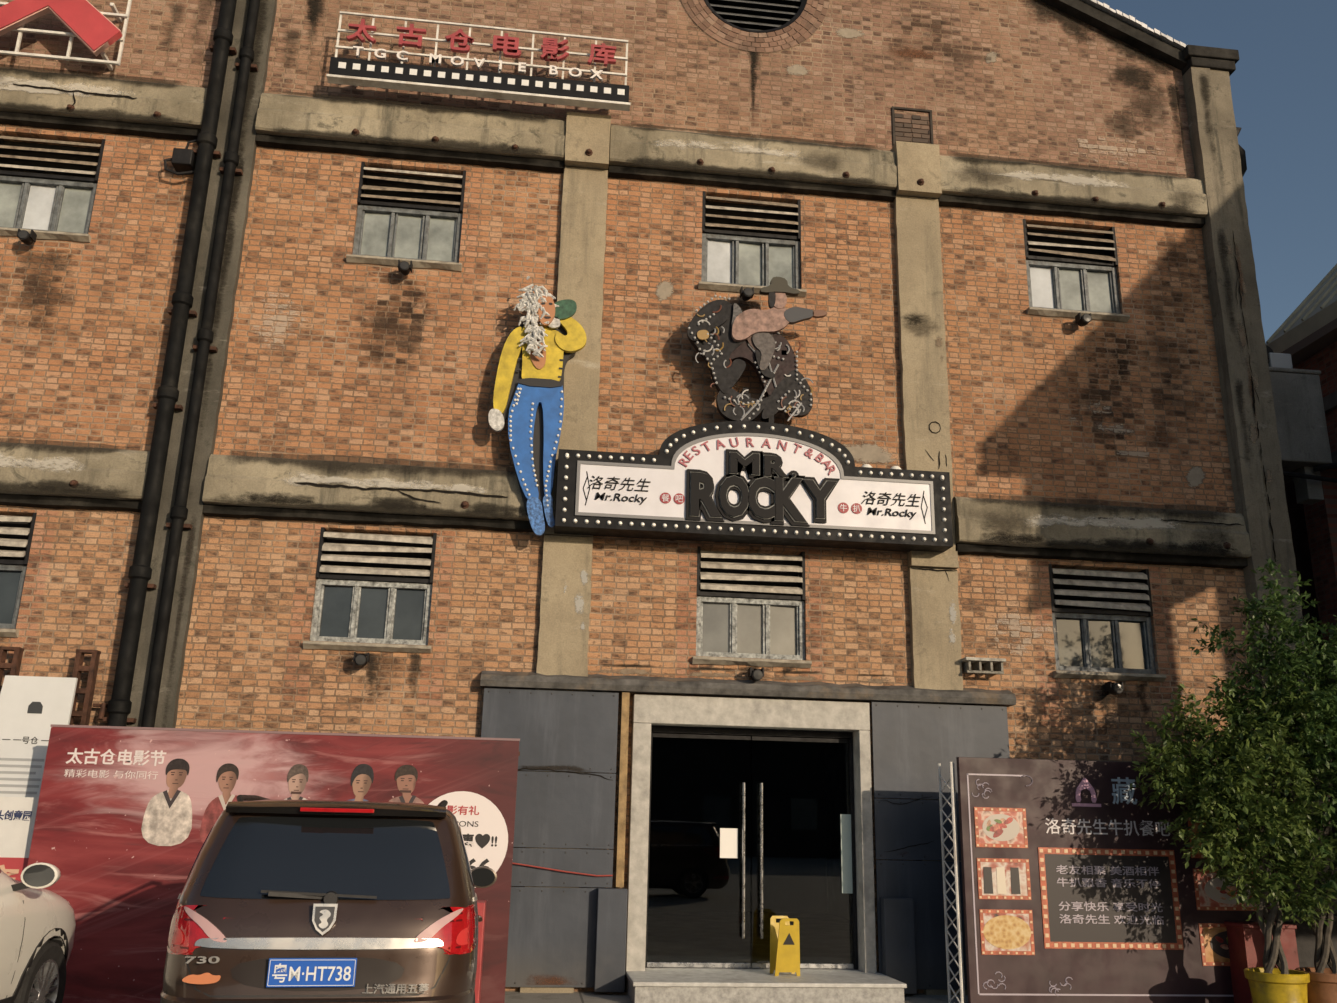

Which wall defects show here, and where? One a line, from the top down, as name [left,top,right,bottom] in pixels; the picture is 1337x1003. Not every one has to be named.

water stain [287,0,325,39]
crack [13,84,136,105]
water stain [750,37,758,102]
water stain [1027,0,1181,147]
crack [1087,234,1276,562]
crack [294,482,507,503]